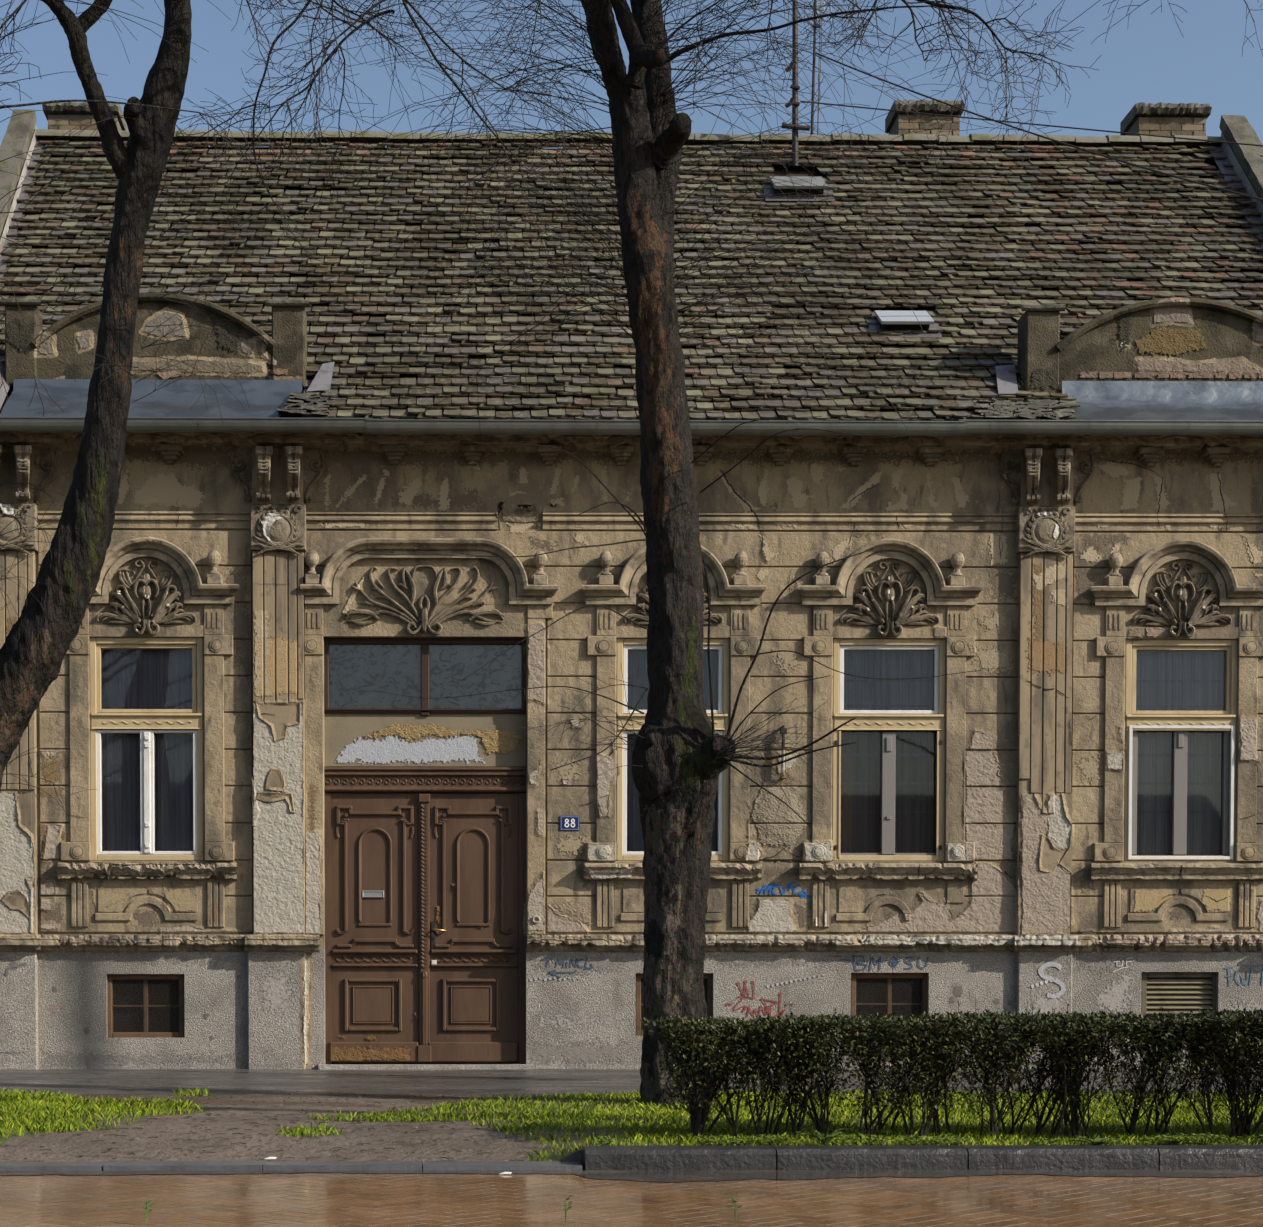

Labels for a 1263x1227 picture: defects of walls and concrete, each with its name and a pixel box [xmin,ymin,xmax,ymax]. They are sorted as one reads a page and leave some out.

flaking render [33,331,59,358]
flaking render [73,330,94,354]
flaking render [131,335,303,382]
peeling [318,469,422,530]
flaking render [1125,623,1193,641]
peeling [335,734,485,765]
spalling [1237,714,1262,764]
flaking render [528,749,620,820]
spalling [0,609,324,1069]
flaking render [534,808,637,883]
flaking render [705,723,1263,951]
flaking render [522,870,591,939]